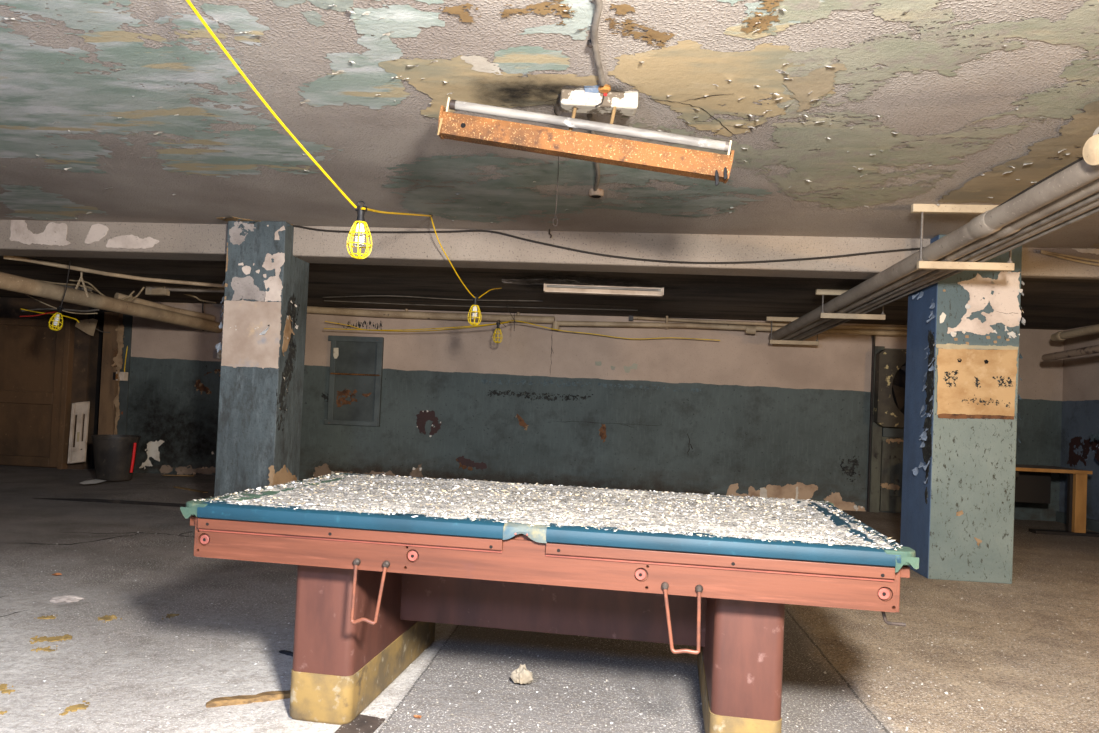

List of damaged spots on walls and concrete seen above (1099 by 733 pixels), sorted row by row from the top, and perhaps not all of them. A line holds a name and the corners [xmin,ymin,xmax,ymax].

peeling [0,0,343,178]
peeling [272,0,1099,210]
peeling [0,184,159,249]
flaking render [194,216,300,431]
peeling [416,410,442,437]
flaking render [195,456,902,550]
flaking render [912,271,1025,504]
peeling [1067,436,1099,467]